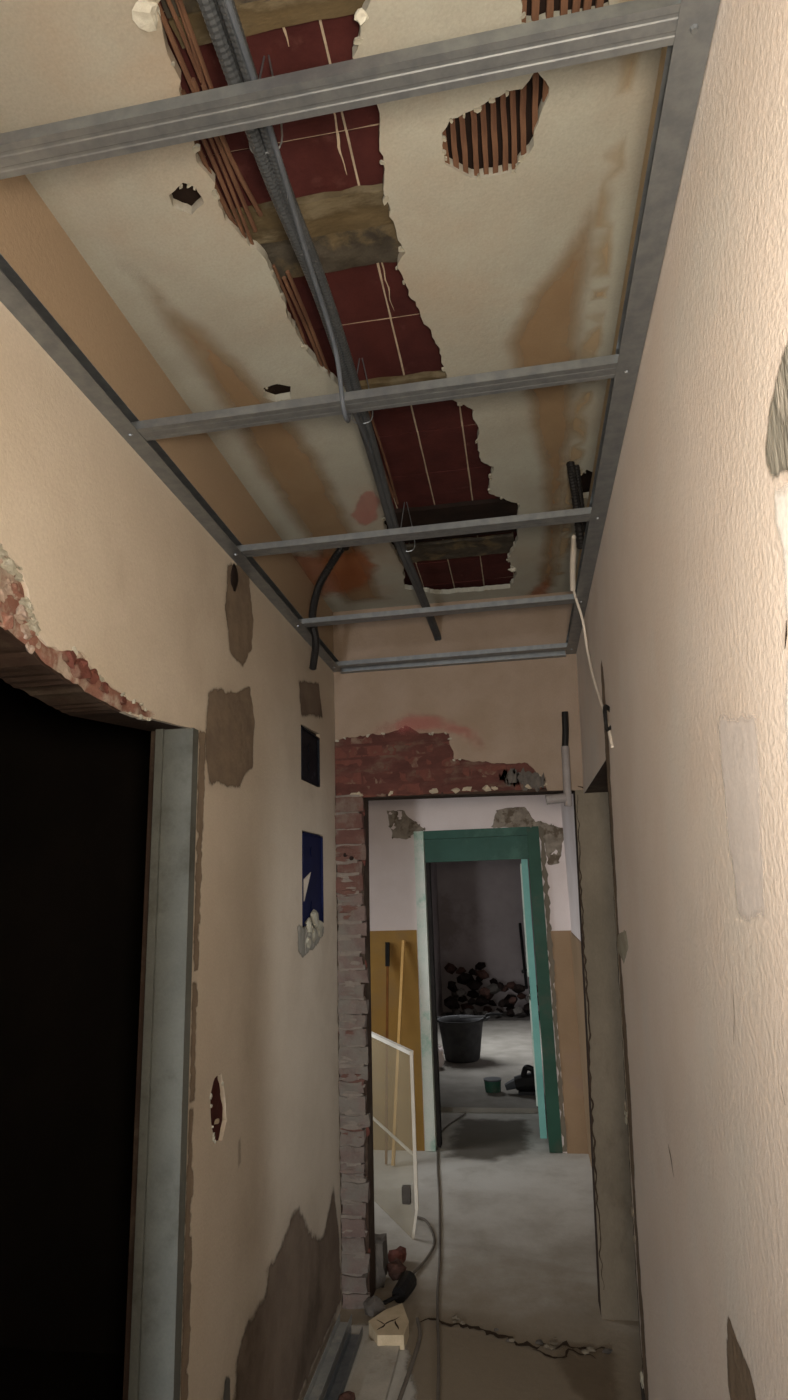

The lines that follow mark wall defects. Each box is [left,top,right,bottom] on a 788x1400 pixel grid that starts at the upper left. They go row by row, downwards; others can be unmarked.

spalling [521,0,609,23]
spalling [442,72,549,181]
spalling [172,183,220,212]
spalling [263,384,290,401]
spalling [0,543,155,721]
flaking render [335,725,567,1309]
crack [420,661,648,1400]
spalling [210,1076,224,1144]